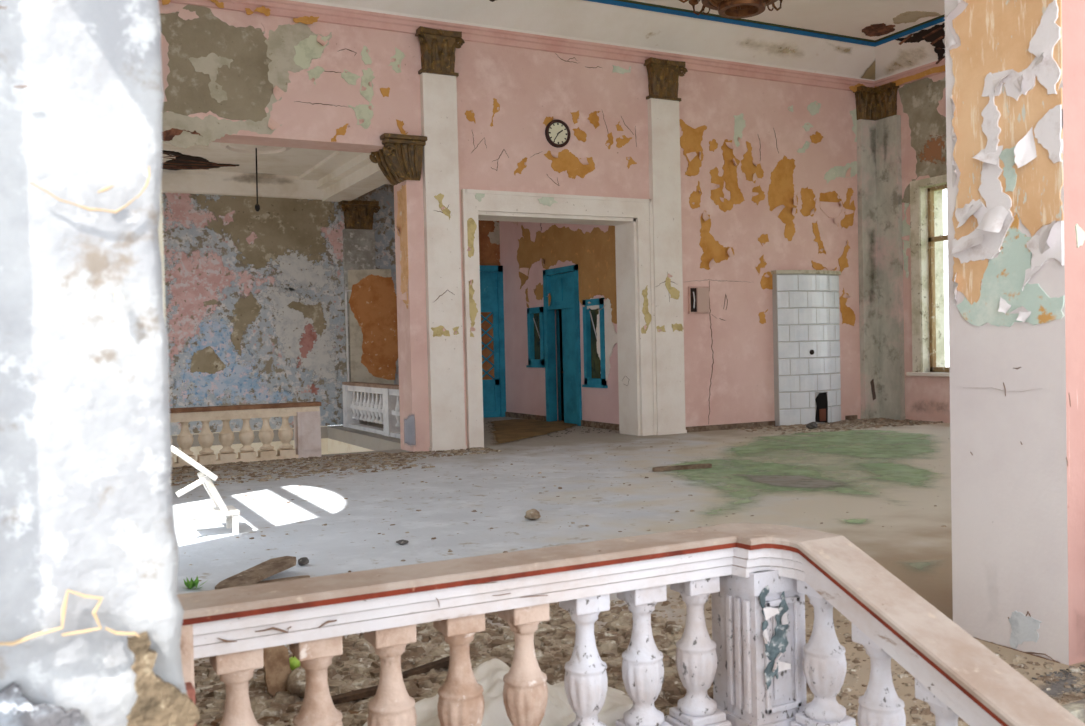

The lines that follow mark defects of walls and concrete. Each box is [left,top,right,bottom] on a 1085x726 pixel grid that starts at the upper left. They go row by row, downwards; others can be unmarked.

flaking render [160,0,332,170]
flaking render [162,192,345,395]
peeling [431,279,478,337]
peeling [513,222,617,381]
peeling [544,149,595,179]
peeling [570,111,637,169]
crack [656,272,746,424]
peeling [755,234,773,290]
peeling [679,101,857,272]
peeling [849,0,1085,327]
flaking render [0,682,83,726]
flaking render [126,631,200,726]